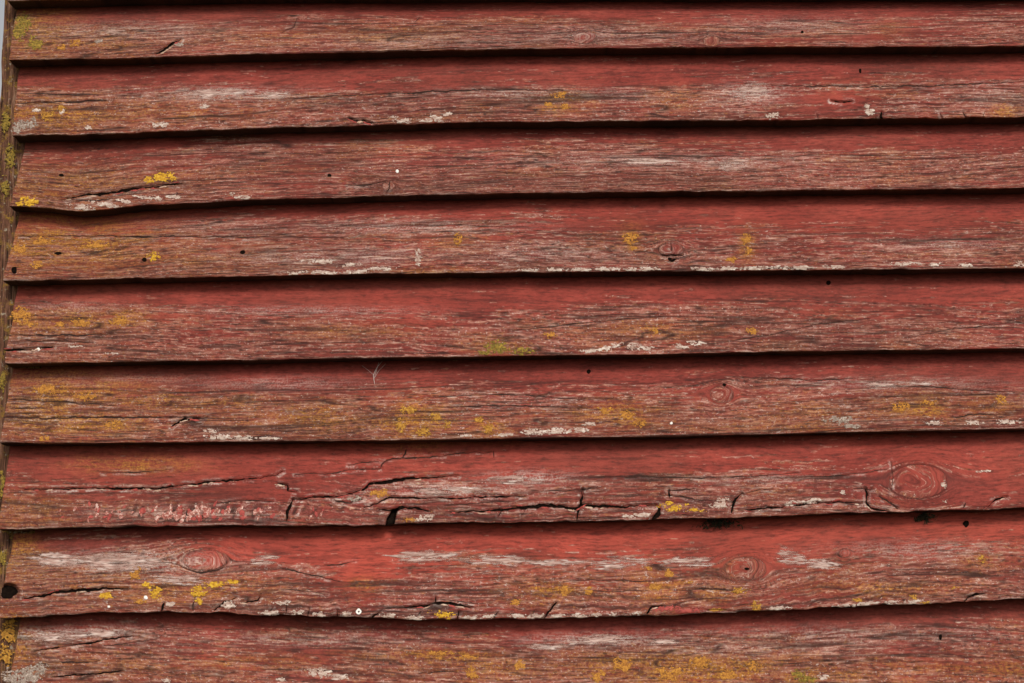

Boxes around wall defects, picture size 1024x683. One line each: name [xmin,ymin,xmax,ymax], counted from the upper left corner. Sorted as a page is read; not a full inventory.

crack [66,182,183,203]
crack [24,450,898,521]
crack [21,587,128,601]
crack [371,597,498,619]